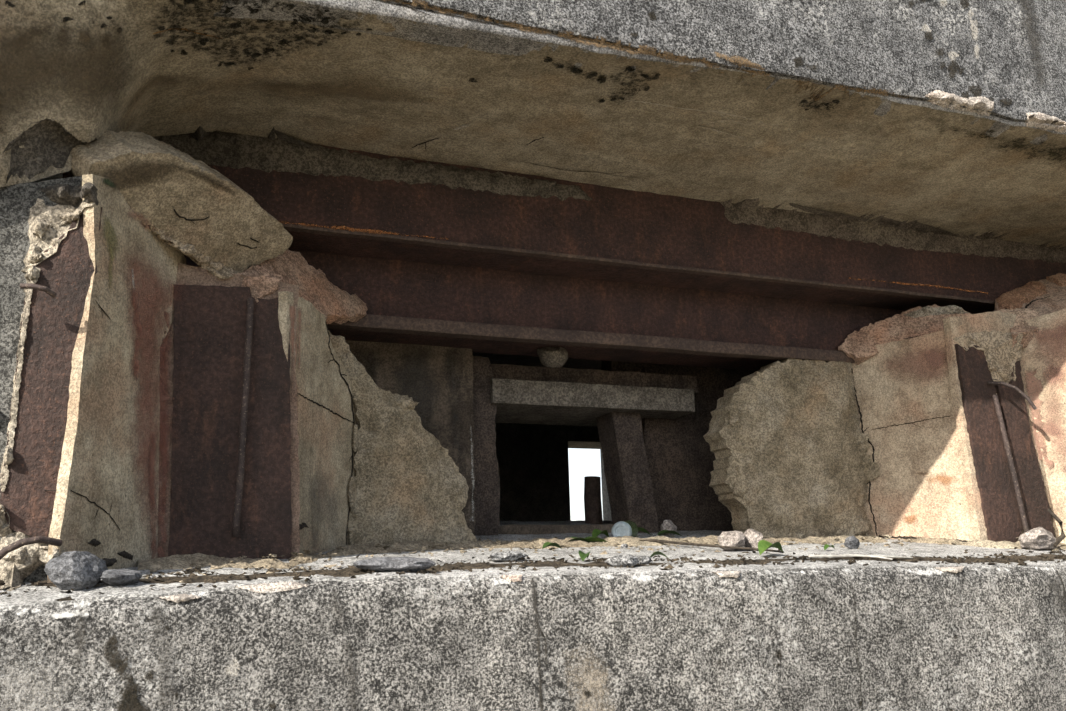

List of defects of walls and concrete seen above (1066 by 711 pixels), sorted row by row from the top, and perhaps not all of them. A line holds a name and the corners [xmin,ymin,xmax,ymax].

damp [154,0,372,70]
spalling [2,118,97,184]
spalling [153,126,592,201]
damp [544,57,661,103]
spalling [925,90,994,116]
spalling [1005,112,1066,148]
spalling [148,223,368,324]
rust [279,220,448,240]
spalling [720,198,1066,310]
peeling [0,179,99,591]
crack [298,324,354,423]
peeling [953,330,1023,383]